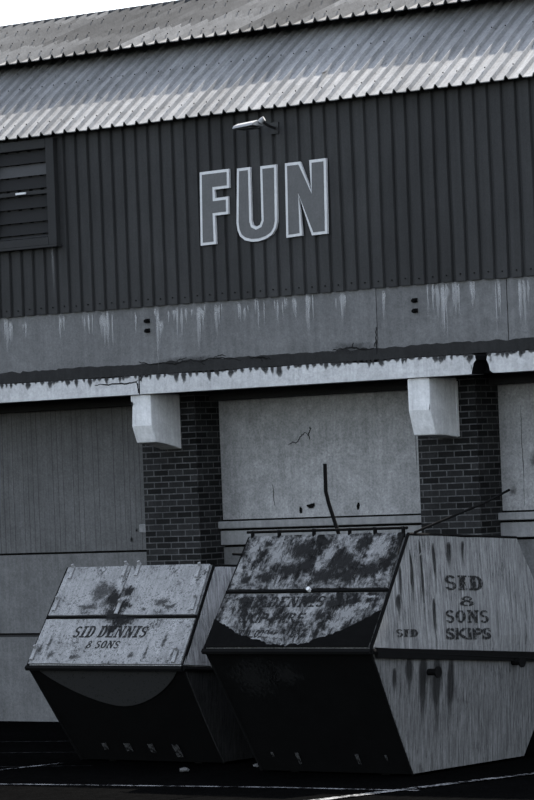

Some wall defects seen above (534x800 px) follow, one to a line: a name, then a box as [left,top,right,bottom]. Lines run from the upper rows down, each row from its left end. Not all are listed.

crack [95,354,271,393]
water stain [0,353,473,389]
water stain [487,349,534,357]